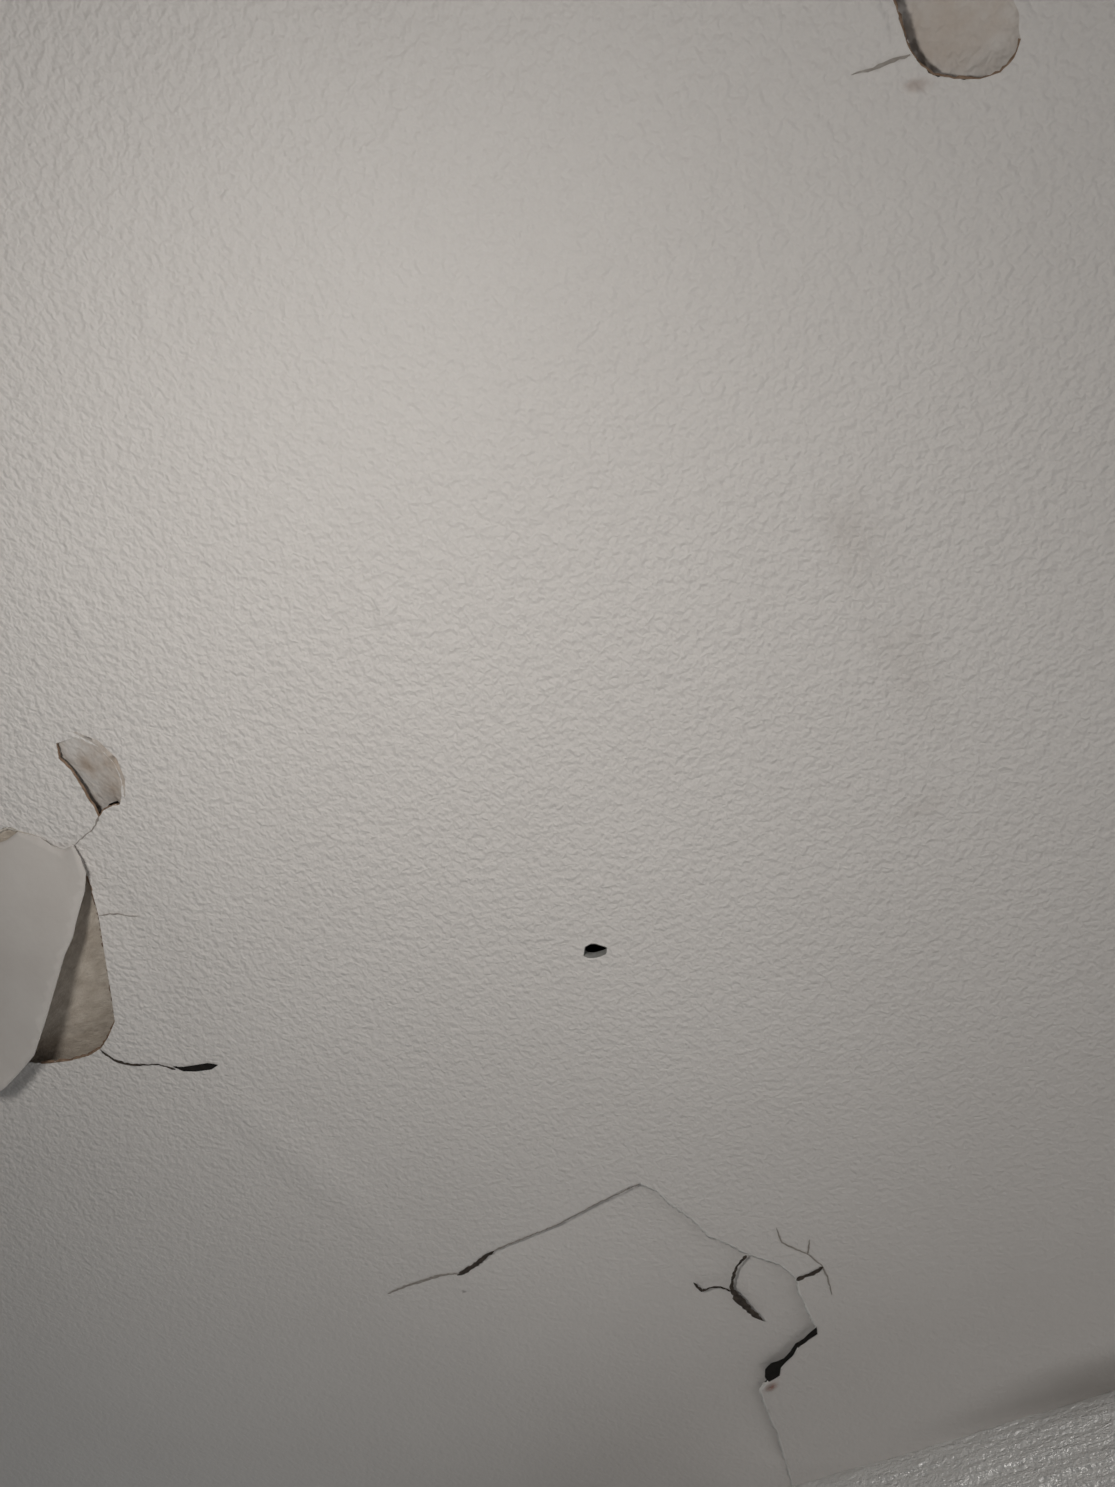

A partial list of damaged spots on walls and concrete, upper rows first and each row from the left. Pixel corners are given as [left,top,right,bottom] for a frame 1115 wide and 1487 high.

peeling [0,827,217,1091]
crack [388,1183,832,1487]